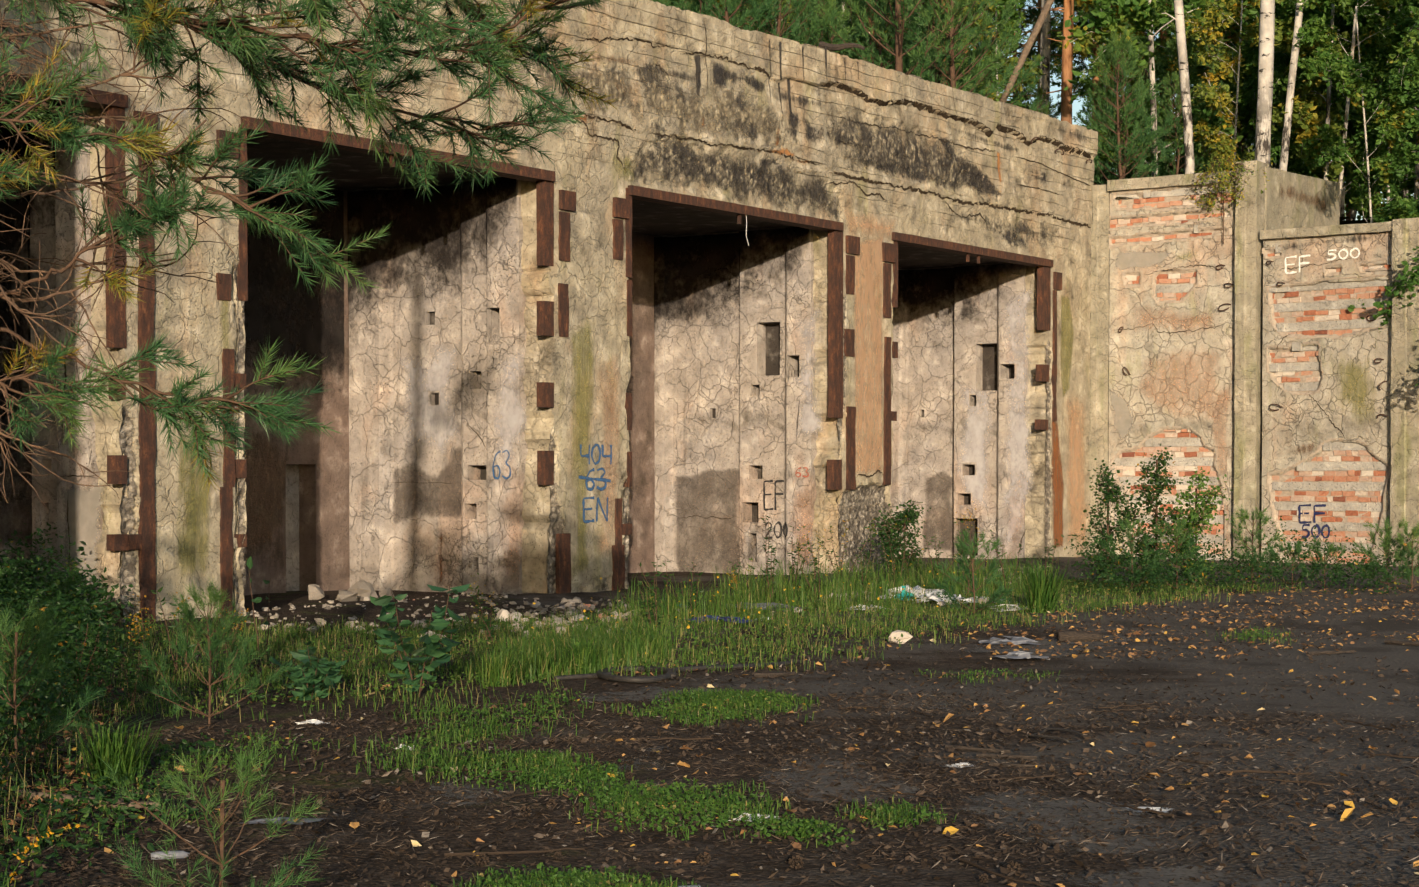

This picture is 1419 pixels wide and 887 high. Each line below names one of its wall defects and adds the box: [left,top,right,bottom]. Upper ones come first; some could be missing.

crack [541,22,769,95]
crack [493,82,1093,228]
leakage [864,138,1000,195]
peeling [1122,267,1198,306]
peeling [1109,182,1236,249]
peeling [1262,244,1284,259]
peeling [1266,256,1392,395]
peeling [1110,426,1226,560]
peeling [1267,438,1390,564]